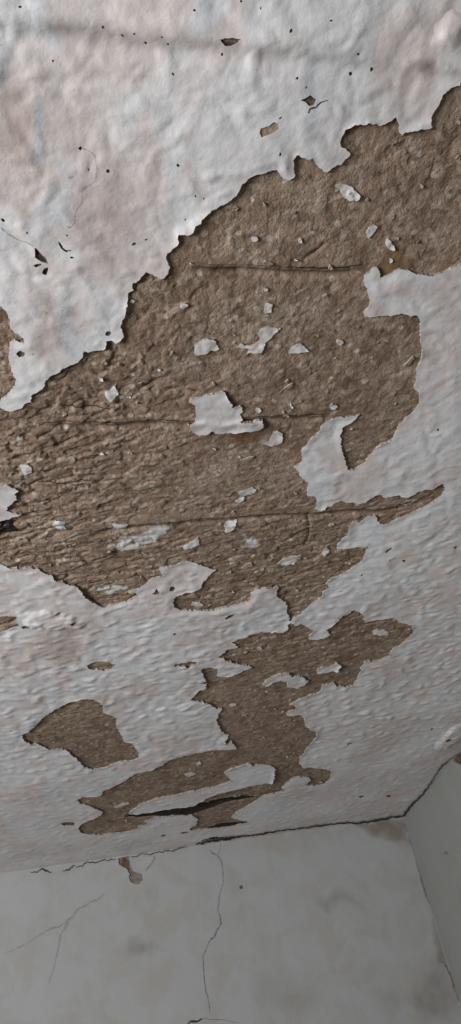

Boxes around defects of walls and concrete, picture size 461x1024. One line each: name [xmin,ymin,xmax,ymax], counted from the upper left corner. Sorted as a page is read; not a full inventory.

peeling [0,83,461,840]
crack [31,753,459,881]